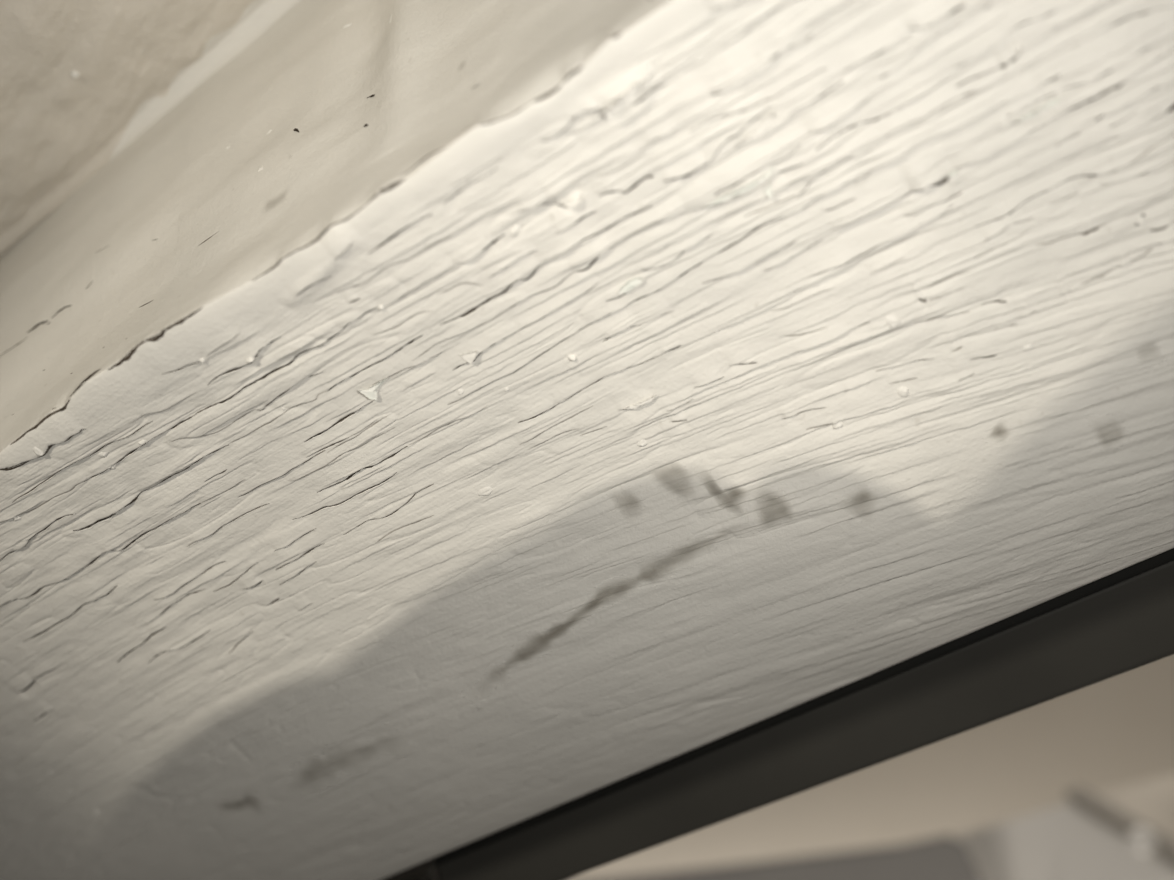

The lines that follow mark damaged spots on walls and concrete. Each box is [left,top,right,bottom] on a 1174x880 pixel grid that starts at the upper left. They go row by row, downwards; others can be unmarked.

crack [0,0,1174,663]
crack [20,668,56,692]